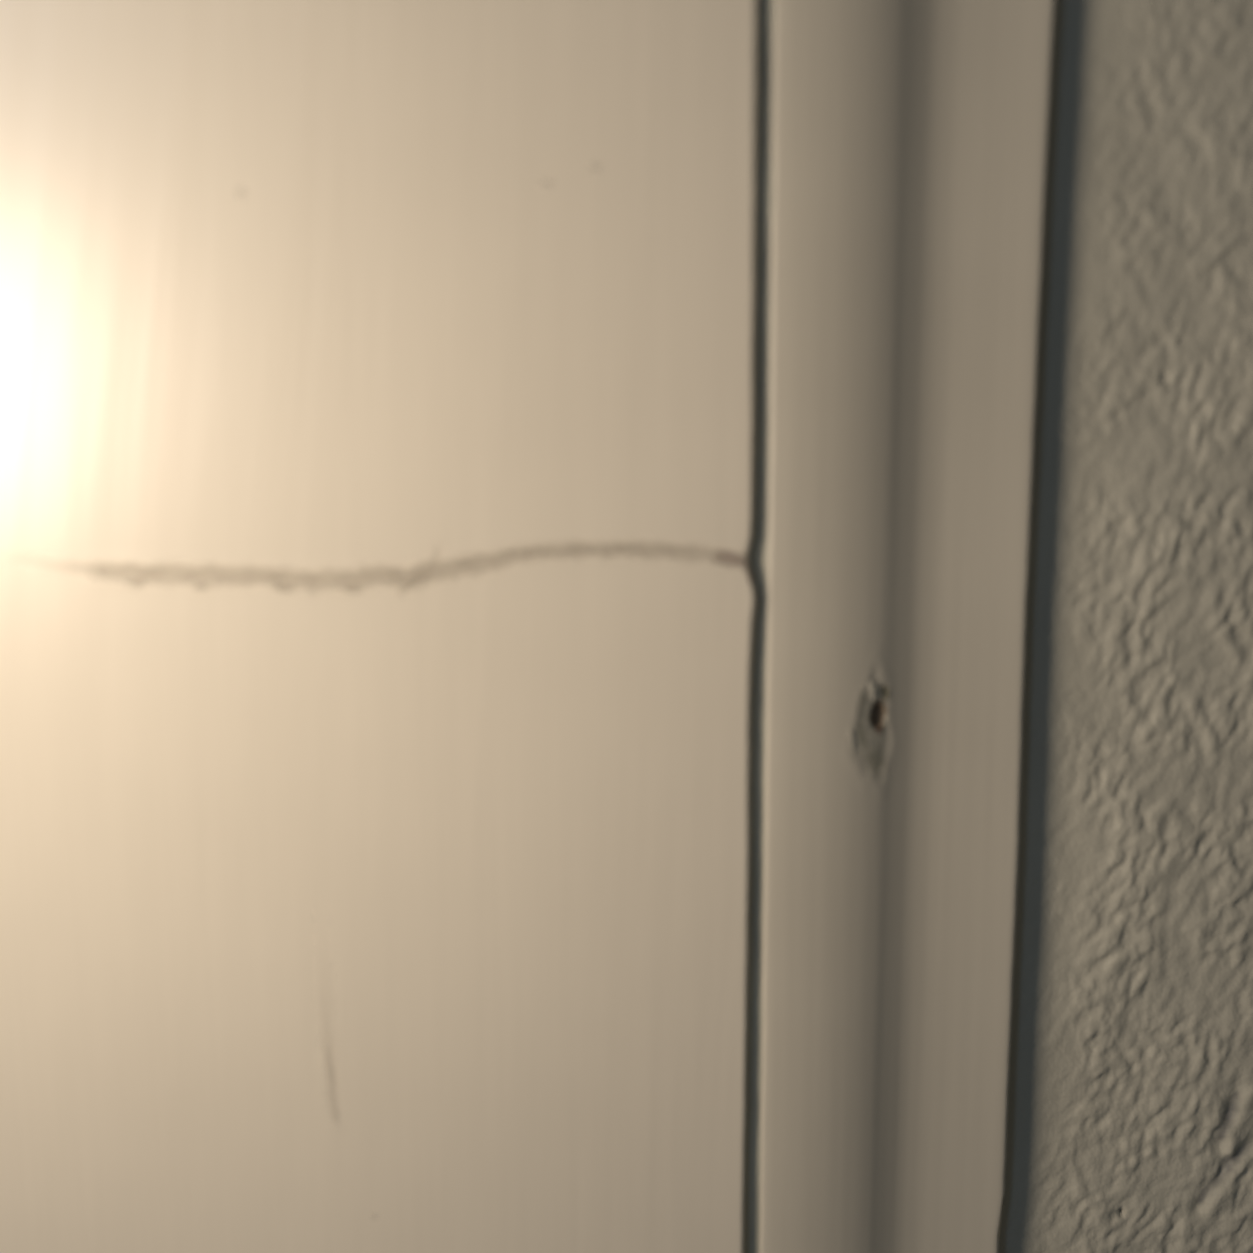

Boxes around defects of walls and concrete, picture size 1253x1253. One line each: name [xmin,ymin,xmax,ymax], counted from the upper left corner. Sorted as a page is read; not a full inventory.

crack [721,554,741,563]